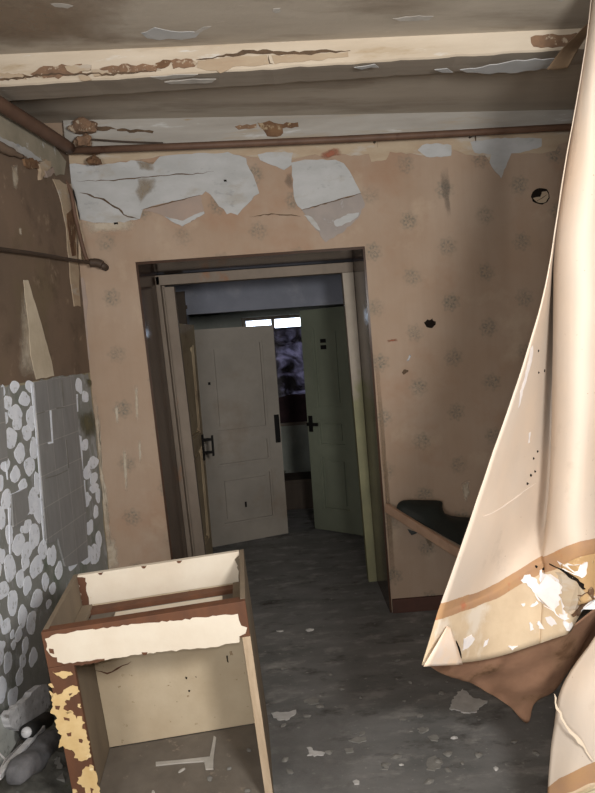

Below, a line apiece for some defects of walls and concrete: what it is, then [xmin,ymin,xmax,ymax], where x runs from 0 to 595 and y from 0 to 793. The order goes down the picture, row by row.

spalling [531,33,577,48]
spalling [0,58,216,84]
peeling [434,58,554,74]
peeling [0,113,570,360]
flaking render [22,280,54,379]